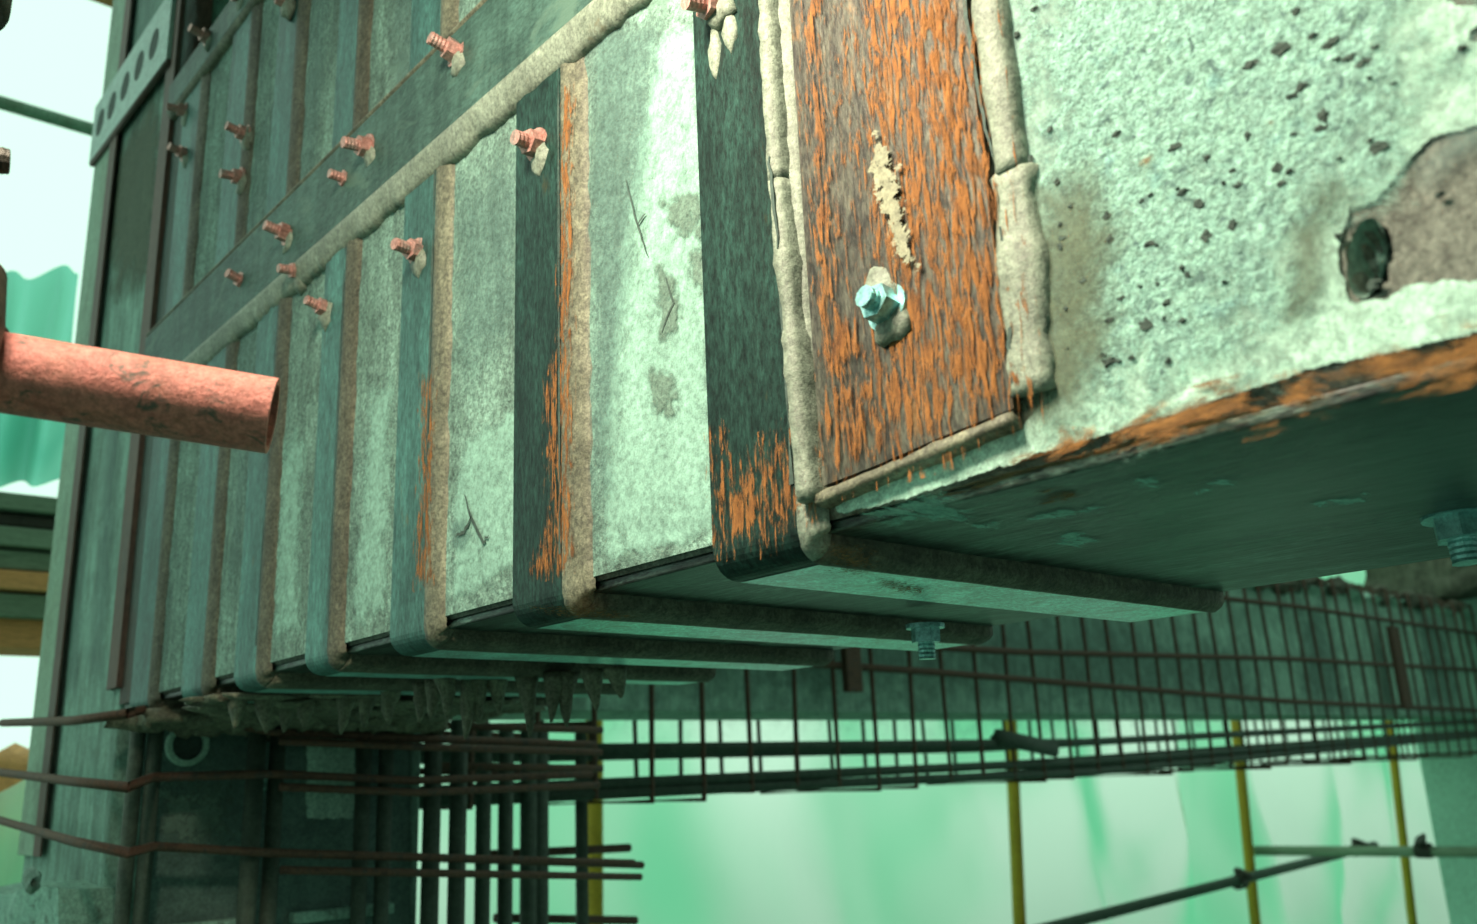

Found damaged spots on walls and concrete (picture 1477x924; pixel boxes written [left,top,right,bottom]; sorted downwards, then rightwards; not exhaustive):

rust [529,85,577,583]
rust [703,422,816,561]
rust [794,0,1043,500]
peeling [835,0,1477,514]
rust [929,324,1477,498]